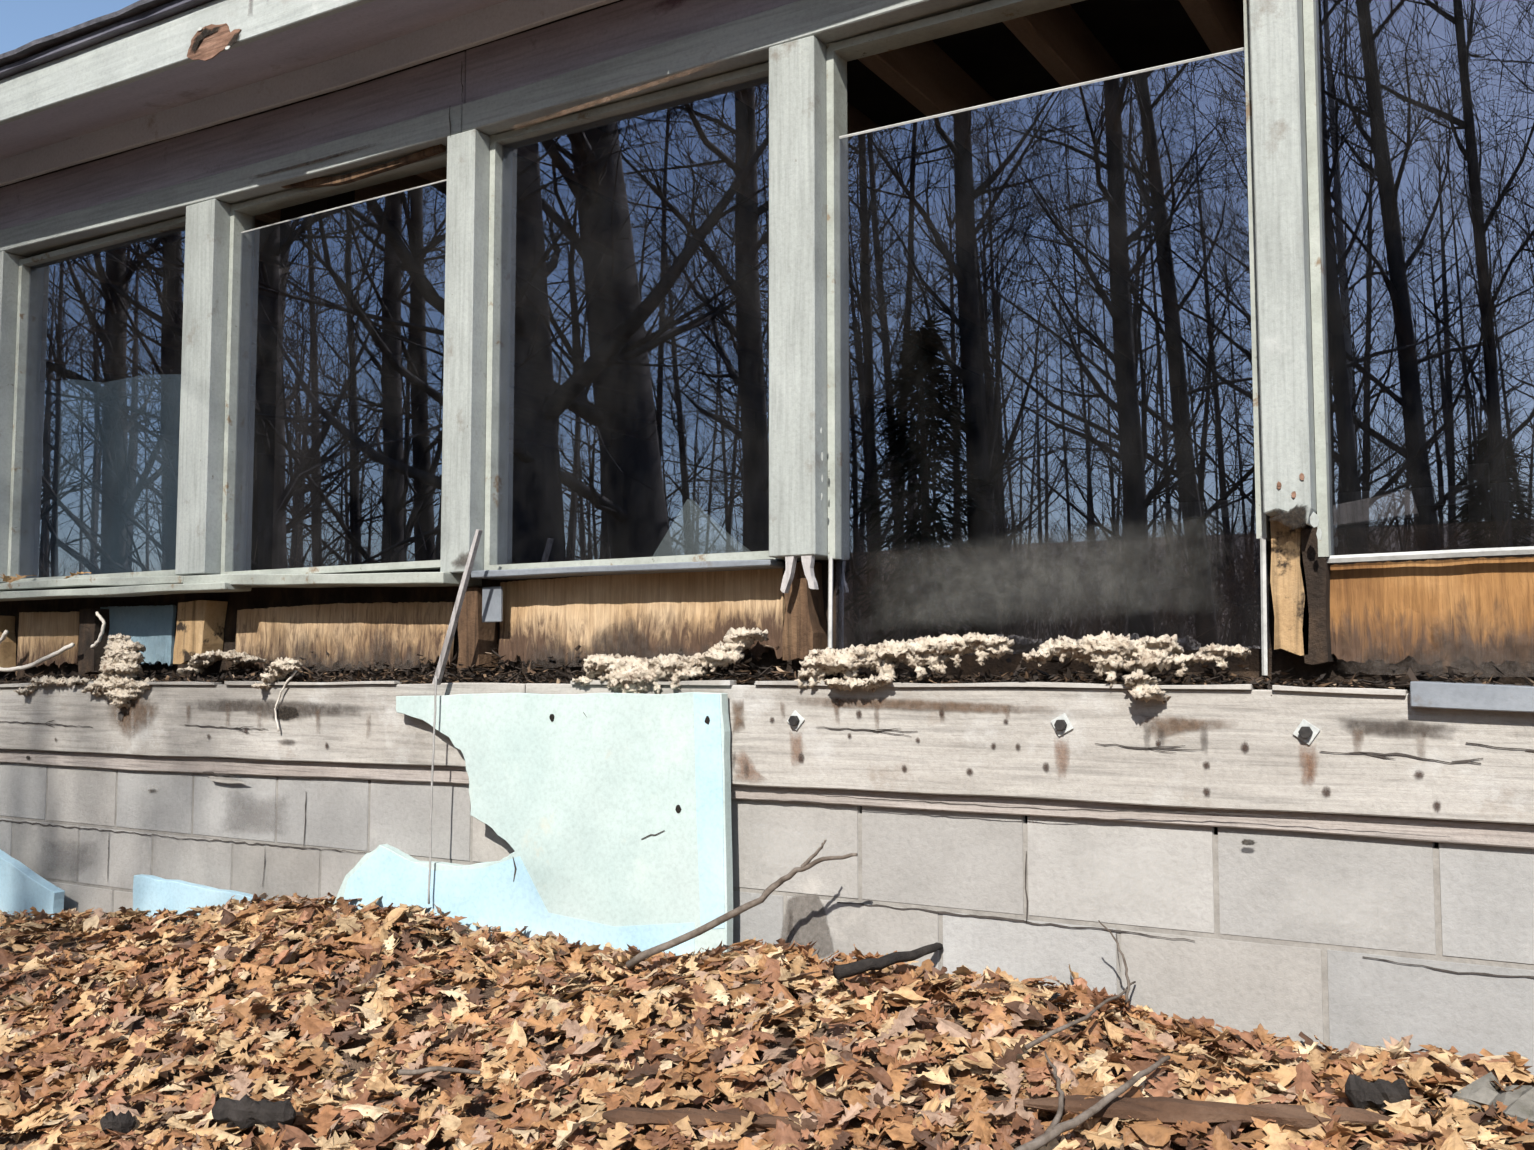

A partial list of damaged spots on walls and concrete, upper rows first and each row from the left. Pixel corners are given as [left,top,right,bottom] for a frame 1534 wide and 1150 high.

peeling [187,23,241,61]
crack [1321,742,1534,764]